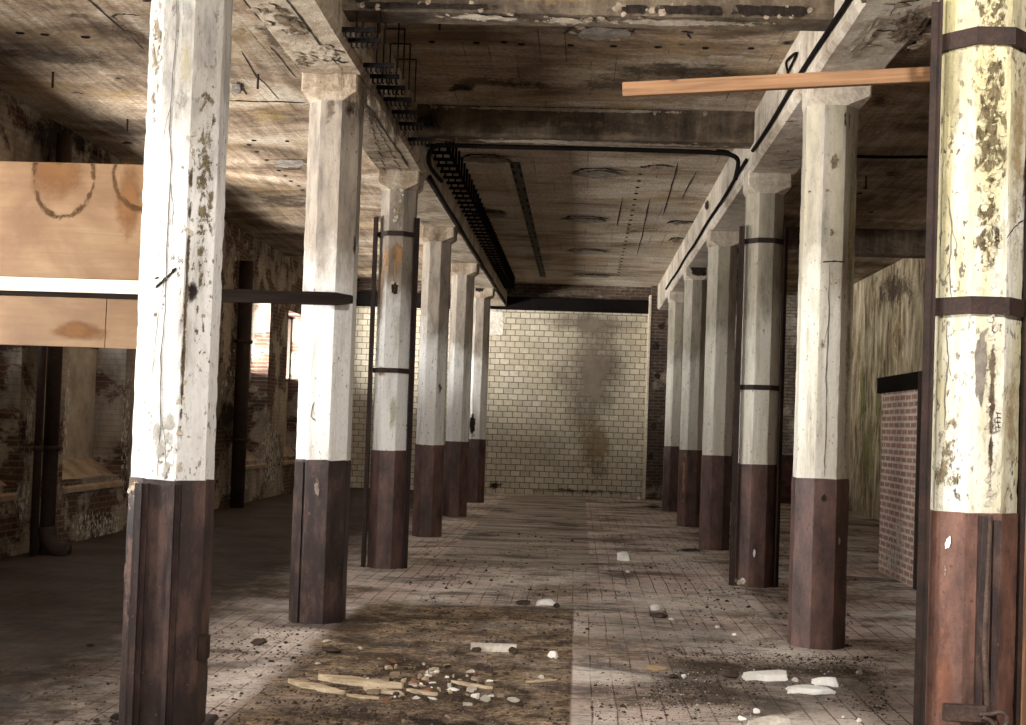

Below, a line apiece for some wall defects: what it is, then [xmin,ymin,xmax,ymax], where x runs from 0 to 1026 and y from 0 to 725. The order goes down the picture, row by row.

peeling [979,0,1008,27]
peeling [973,44,1007,289]
peeling [153,86,216,477]
water stain [563,315,619,421]
peeling [935,418,962,495]
spalling [975,314,999,507]